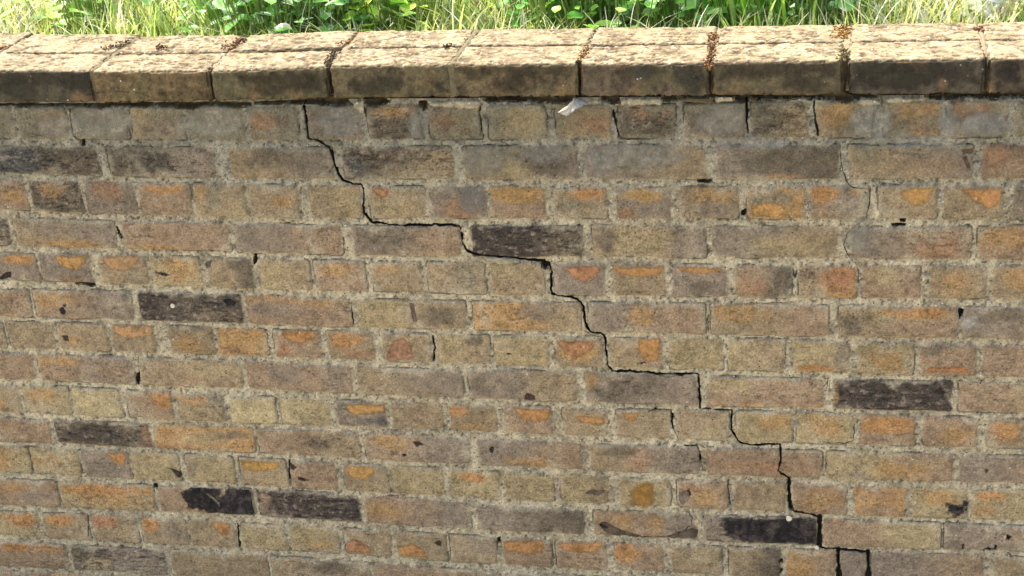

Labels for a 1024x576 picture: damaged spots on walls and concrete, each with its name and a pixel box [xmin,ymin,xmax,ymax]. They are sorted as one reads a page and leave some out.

crack [303,100,871,576]